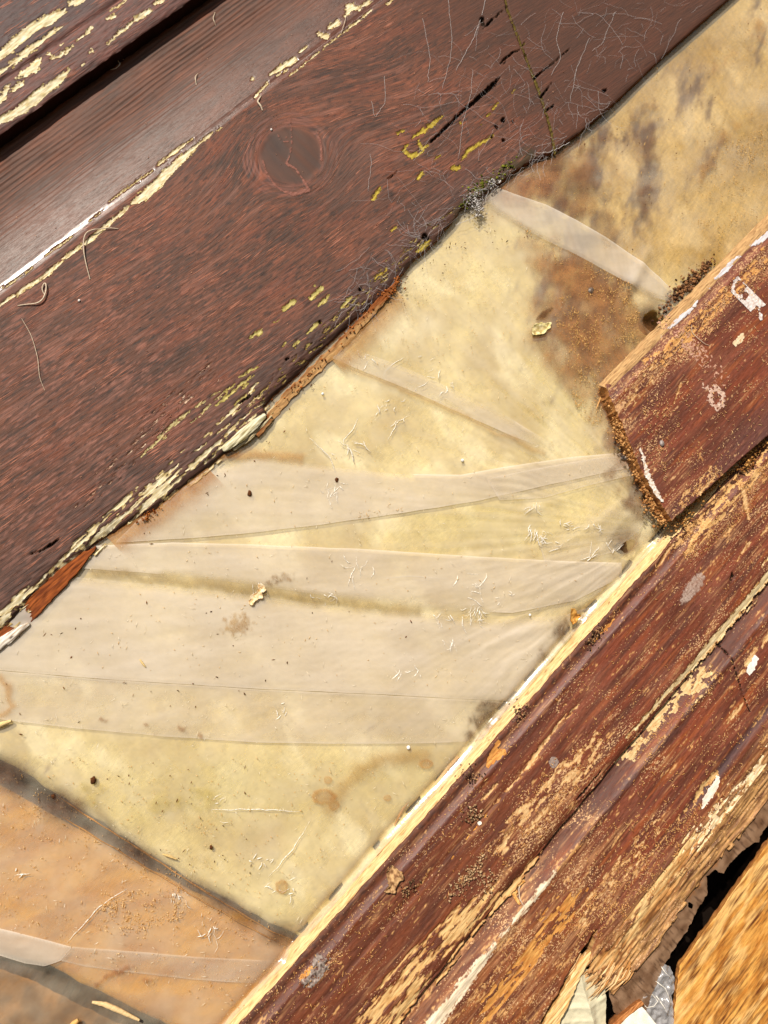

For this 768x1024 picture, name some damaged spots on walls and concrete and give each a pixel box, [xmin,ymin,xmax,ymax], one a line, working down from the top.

peeling [0,0,94,124]
peeling [251,0,372,99]
crack [430,0,569,154]
peeling [0,127,222,307]
peeling [0,208,456,630]
leakage [537,257,646,399]
peeling [613,231,768,435]
peeling [653,441,768,574]
peeling [614,557,768,766]
peeling [480,703,580,804]
peeling [355,730,664,1024]
peeling [587,743,768,987]